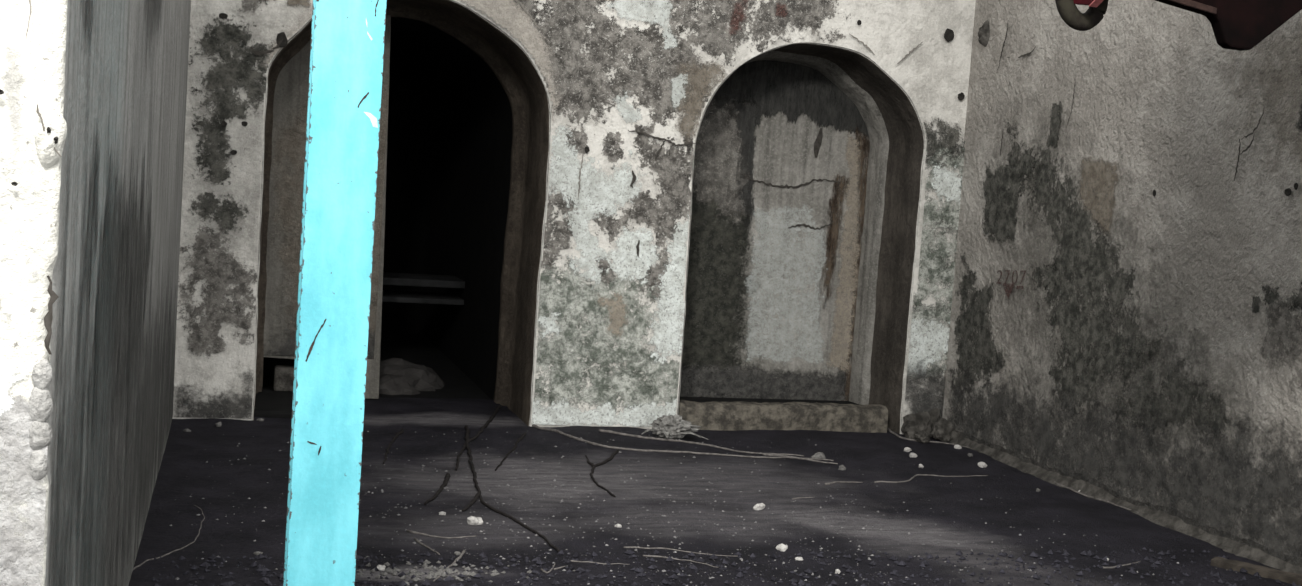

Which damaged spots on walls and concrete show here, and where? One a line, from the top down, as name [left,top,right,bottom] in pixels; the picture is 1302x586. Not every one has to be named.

leakage [0,0,277,586]
leakage [533,96,847,421]
crack [744,175,839,189]
crack [788,221,834,230]
leakage [905,101,1302,567]